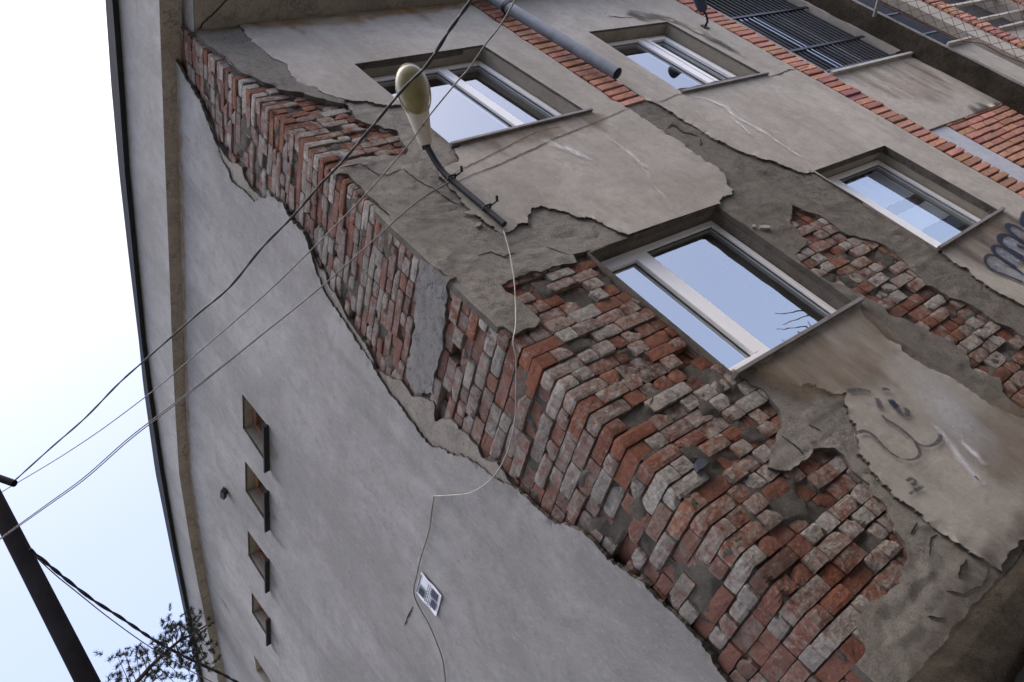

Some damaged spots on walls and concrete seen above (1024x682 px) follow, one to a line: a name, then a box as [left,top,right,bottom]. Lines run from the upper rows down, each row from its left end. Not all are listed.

flaking render [180,26,1024,682]